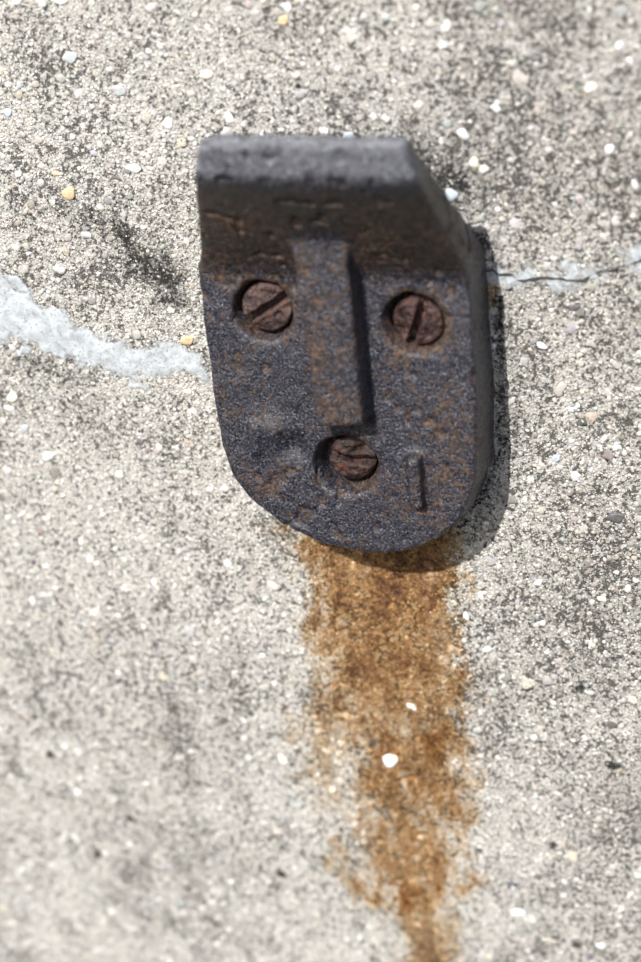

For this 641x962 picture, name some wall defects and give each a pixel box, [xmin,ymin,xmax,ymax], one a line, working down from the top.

crack [487,260,641,283]
rust [348,536,455,785]